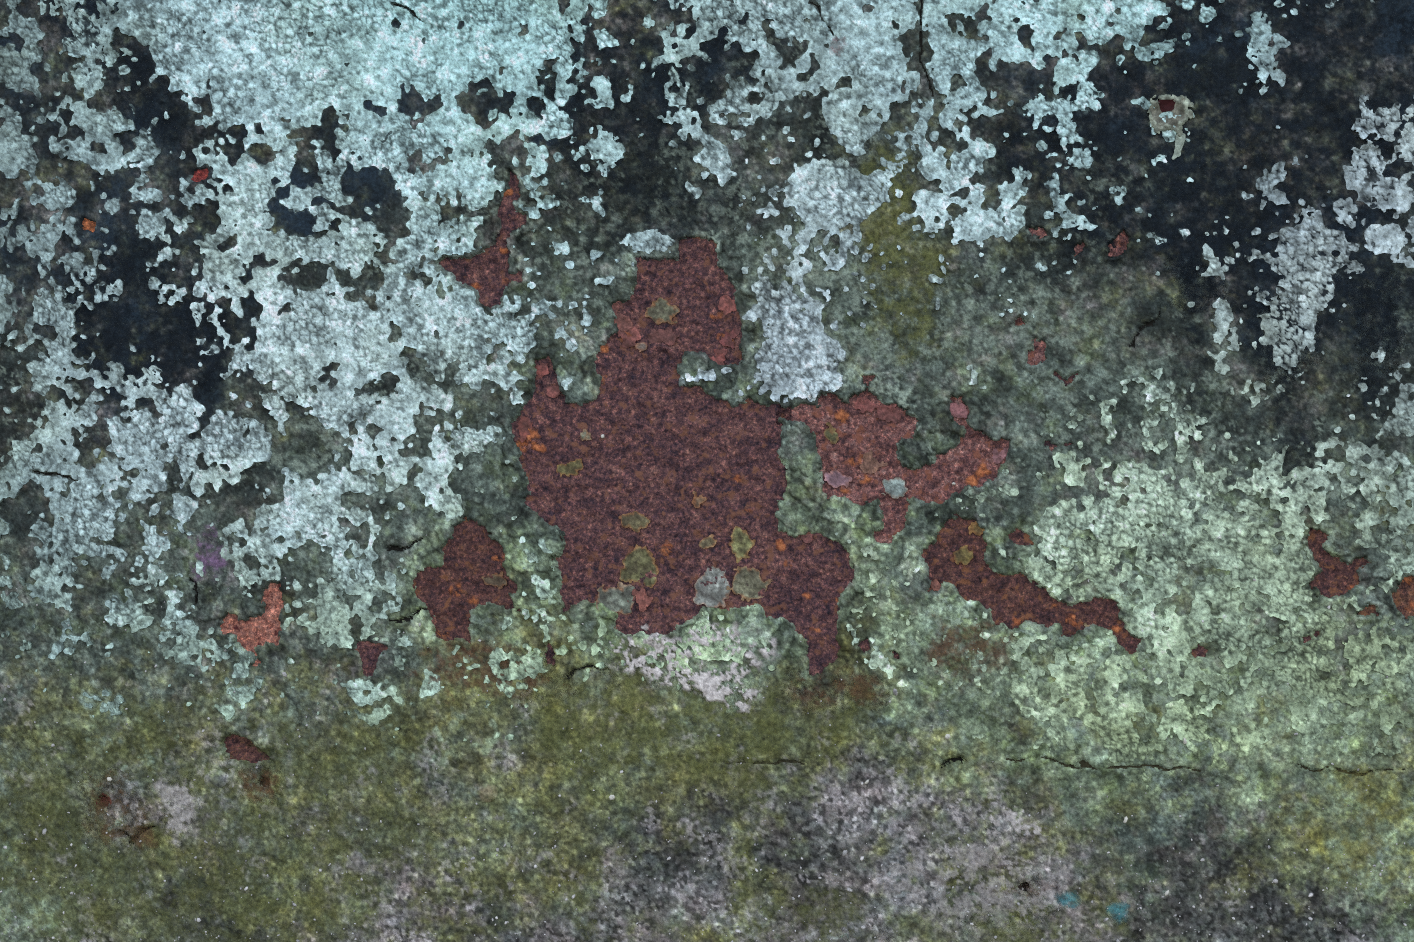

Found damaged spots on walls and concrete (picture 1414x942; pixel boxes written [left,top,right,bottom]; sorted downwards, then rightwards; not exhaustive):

corrosion [439,171,527,308]
peeling [1109,94,1414,407]
peeling [0,0,1308,740]
corrosion [511,237,1141,676]
corrosion [220,583,284,667]
corrosion [412,517,521,644]
peeling [835,347,1414,795]
corrosion [1307,528,1371,598]
corrosion [1357,604,1379,616]
corrosion [1392,576,1414,619]
leakage [949,799,1041,835]